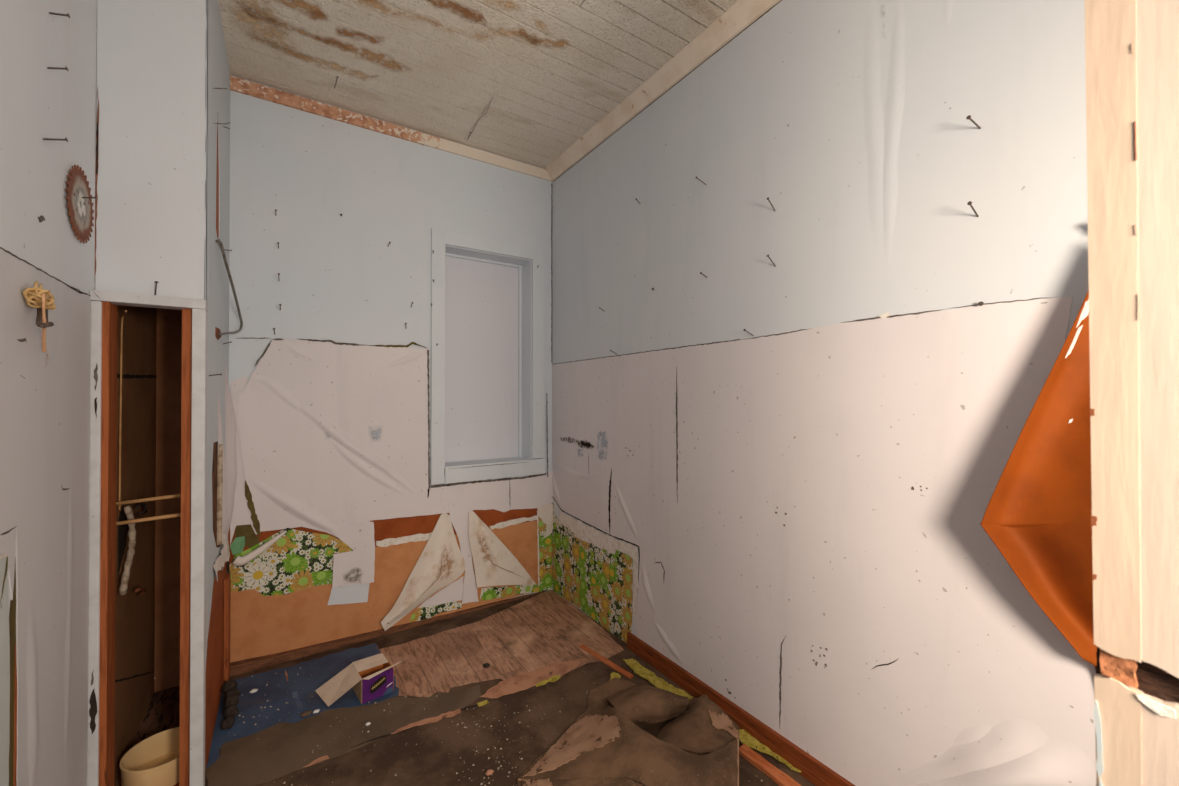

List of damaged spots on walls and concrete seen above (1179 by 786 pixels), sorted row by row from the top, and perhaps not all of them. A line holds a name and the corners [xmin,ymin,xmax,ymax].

damp [236,0,401,79]
damp [428,0,483,38]
damp [499,24,567,47]
crack [551,0,812,502]
crack [842,297,1053,323]
peeling [376,532,432,547]
peeling [489,516,538,530]
crack [778,635,786,721]